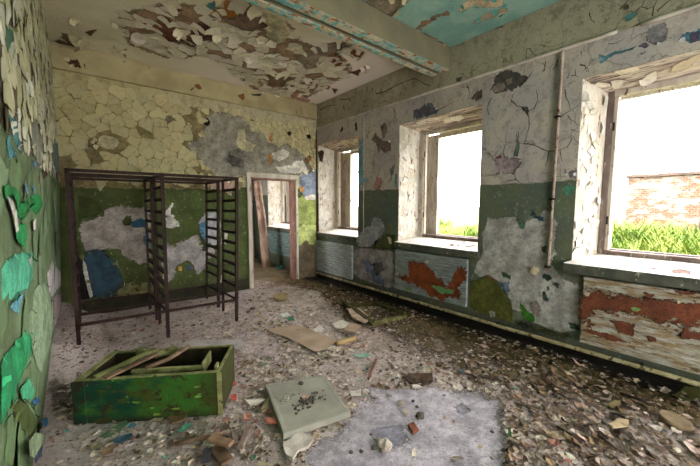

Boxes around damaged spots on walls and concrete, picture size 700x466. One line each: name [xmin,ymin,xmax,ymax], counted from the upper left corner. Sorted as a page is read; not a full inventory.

peeling [459,0,507,25]
crack [480,48,589,183]
peeling [561,91,609,196]
flaking render [0,0,464,466]
flaking render [448,209,582,332]
peeling [572,196,601,258]